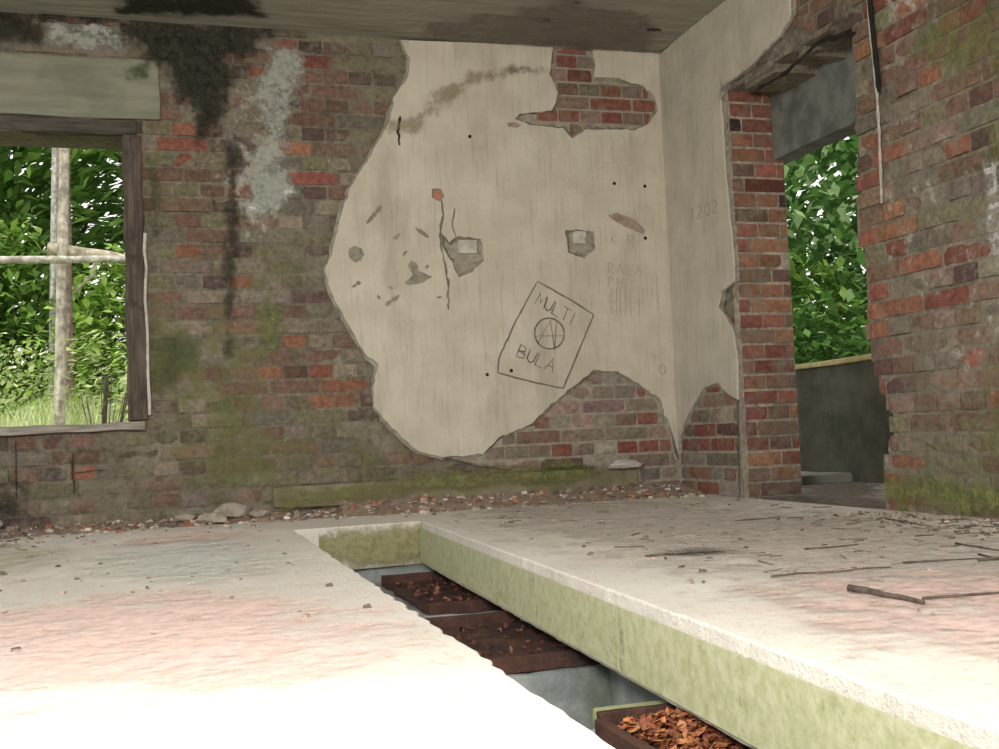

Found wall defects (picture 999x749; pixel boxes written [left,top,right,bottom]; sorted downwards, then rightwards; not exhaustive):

leakage [0,0,273,136]
flaking render [515,47,657,138]
leakage [223,140,240,315]
crack [439,198,456,310]
leakage [985,162,999,240]
flaking render [444,371,744,498]